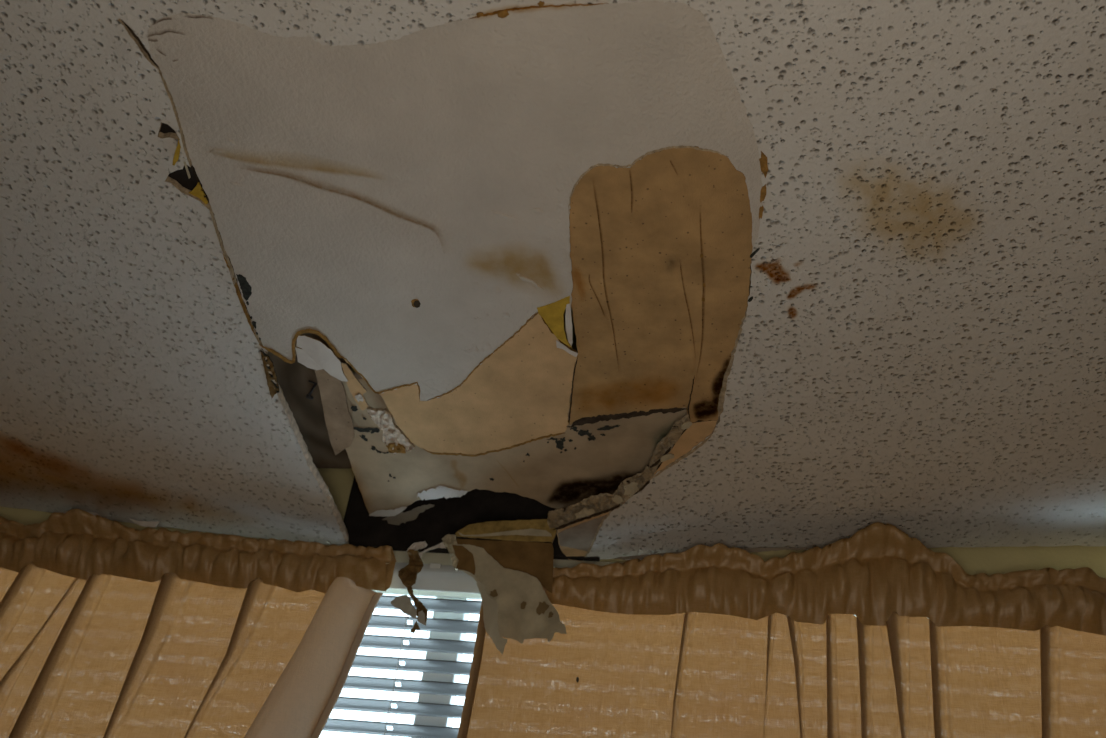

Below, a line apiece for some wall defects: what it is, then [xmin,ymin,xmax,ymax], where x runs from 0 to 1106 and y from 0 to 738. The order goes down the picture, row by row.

crack [122,17,211,68]
crack [191,165,209,203]
crack [219,232,264,352]
flaking render [147,1,768,562]
water stain [694,360,729,419]